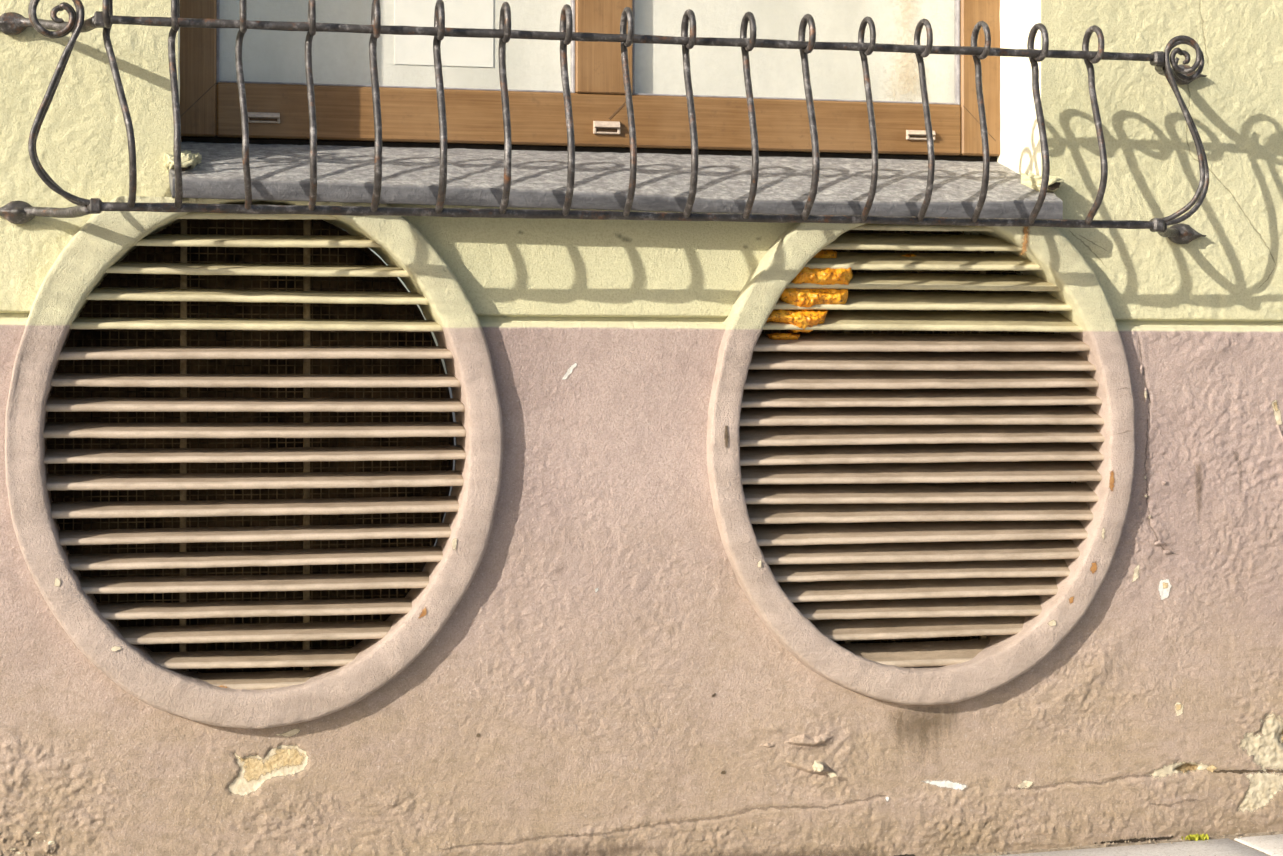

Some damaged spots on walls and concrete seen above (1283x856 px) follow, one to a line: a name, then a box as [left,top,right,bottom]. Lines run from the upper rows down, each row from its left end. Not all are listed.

peeling [229,729,308,796]
flaking render [1239,714,1283,813]
peeling [0,832,57,856]